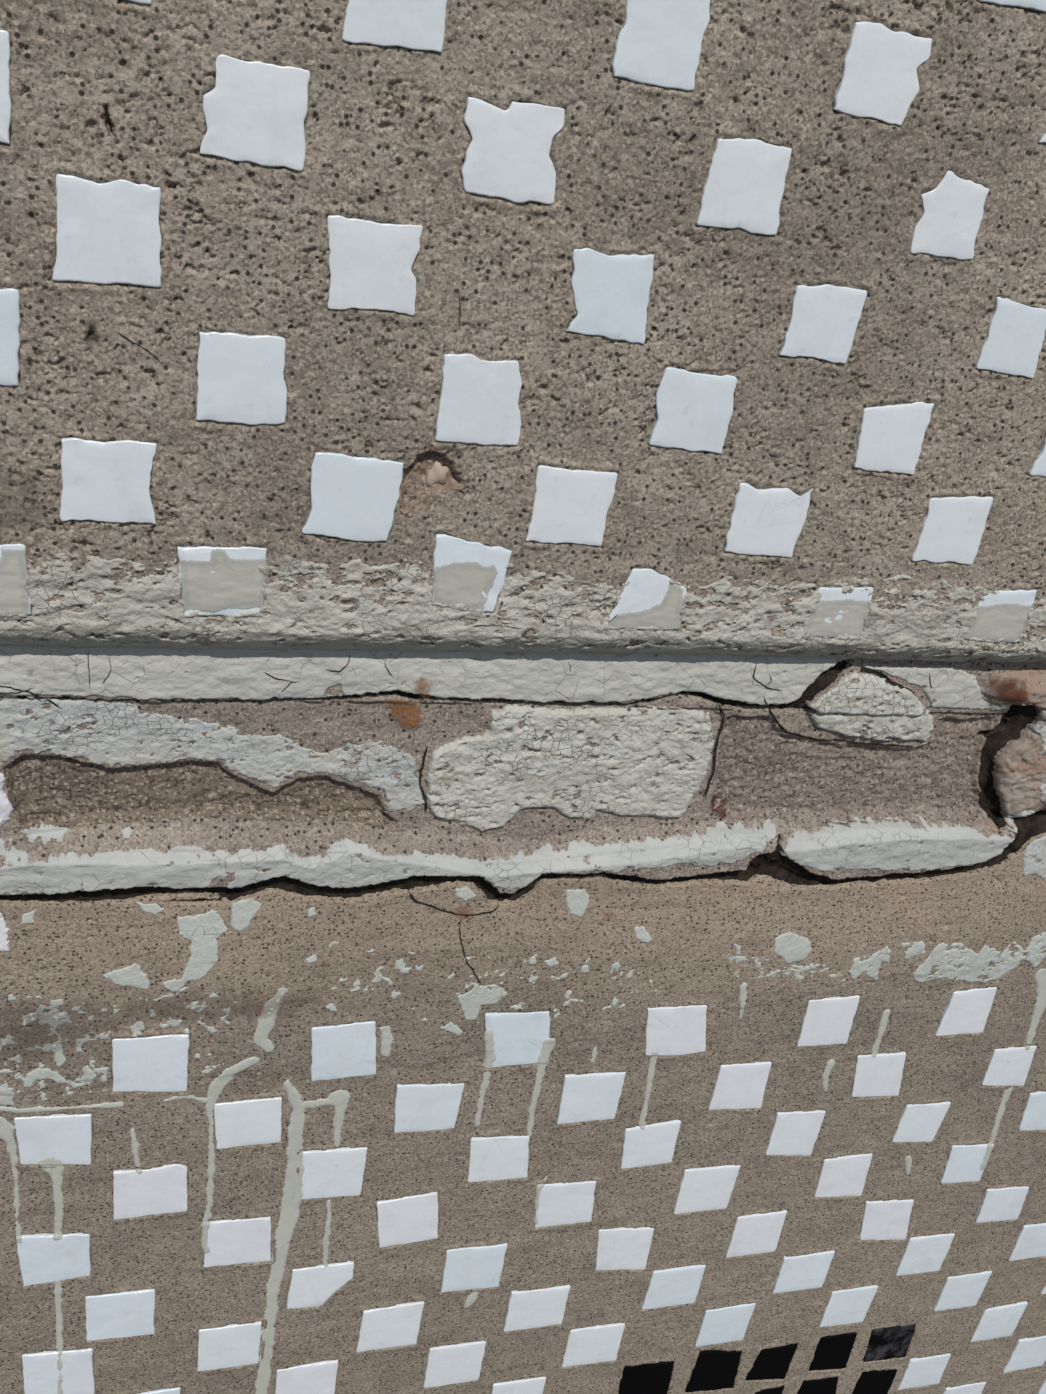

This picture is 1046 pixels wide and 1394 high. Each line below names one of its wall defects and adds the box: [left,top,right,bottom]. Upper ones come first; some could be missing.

spalling [398,448,477,518]
crack [266,673,298,698]
crack [329,655,513,701]
rust [989,676,1029,705]
crack [552,660,932,800]
peeling [0,550,1046,1106]
crack [0,705,1046,984]